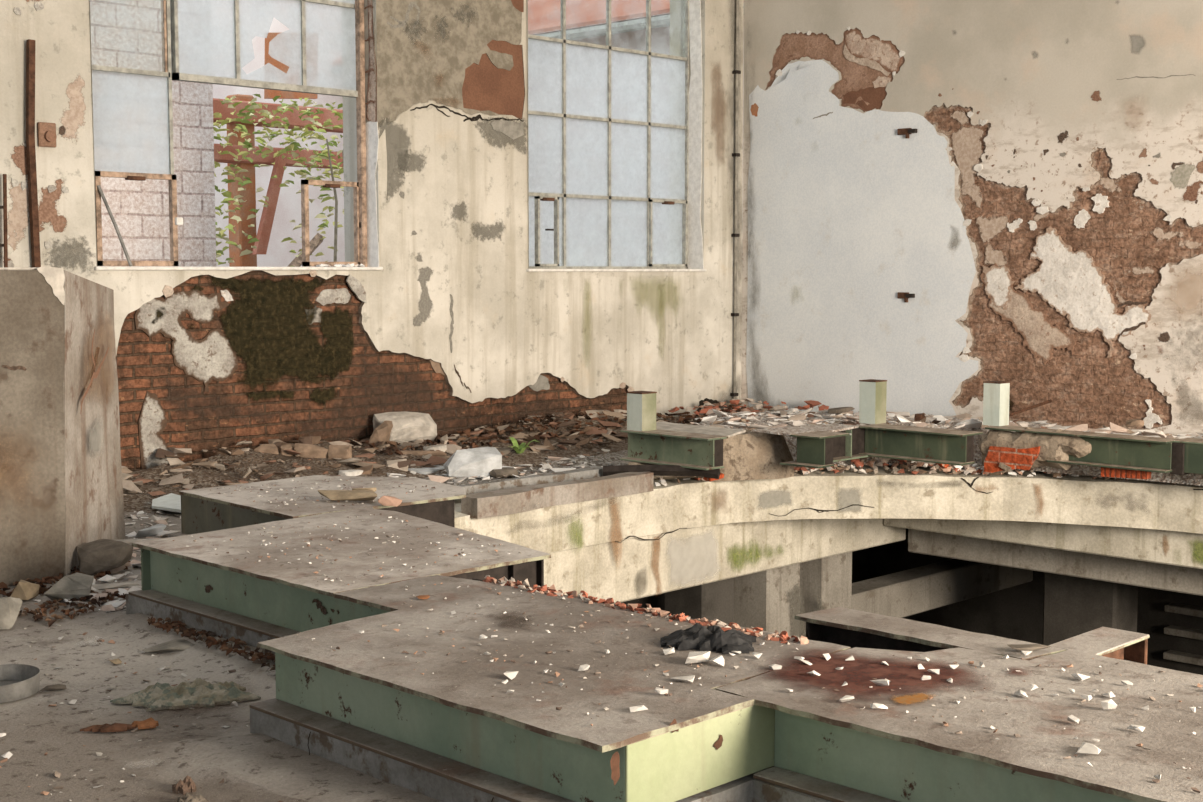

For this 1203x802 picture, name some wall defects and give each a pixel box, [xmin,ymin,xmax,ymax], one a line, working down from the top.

flaking render [462,40,525,119]
crack [410,104,524,140]
flaking render [11,140,69,249]
peeling [746,26,1203,430]
flaking render [413,253,433,326]
flaking render [116,270,634,471]
crack [771,504,874,516]